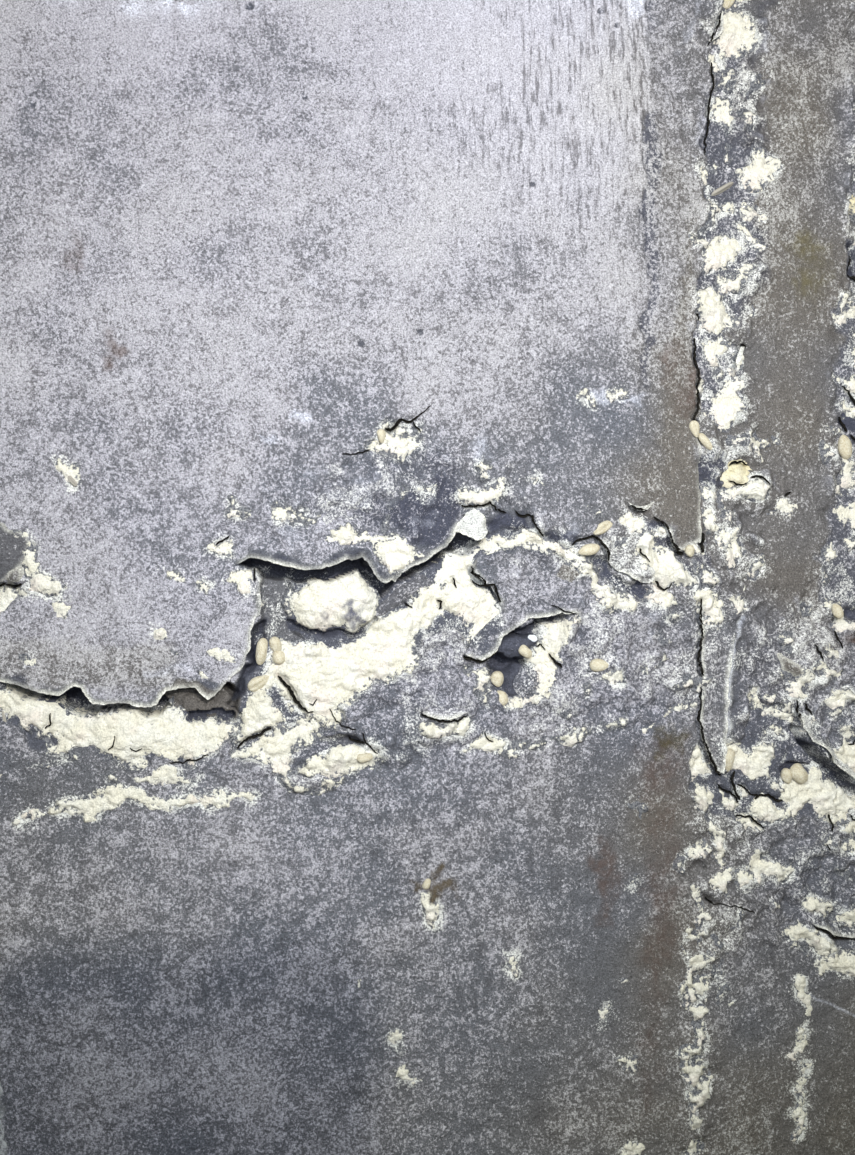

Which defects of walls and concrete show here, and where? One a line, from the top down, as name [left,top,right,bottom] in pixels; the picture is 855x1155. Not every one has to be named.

crack [703,13,721,153]
crack [693,313,701,421]
peeling [0,494,655,775]
crack [795,700,813,717]
leakage [821,816,855,853]
crack [826,814,855,851]
crack [814,926,855,940]
leakage [672,813,734,1155]
leakage [782,897,855,1142]
leakage [615,1055,639,1073]
leakage [620,1141,645,1155]